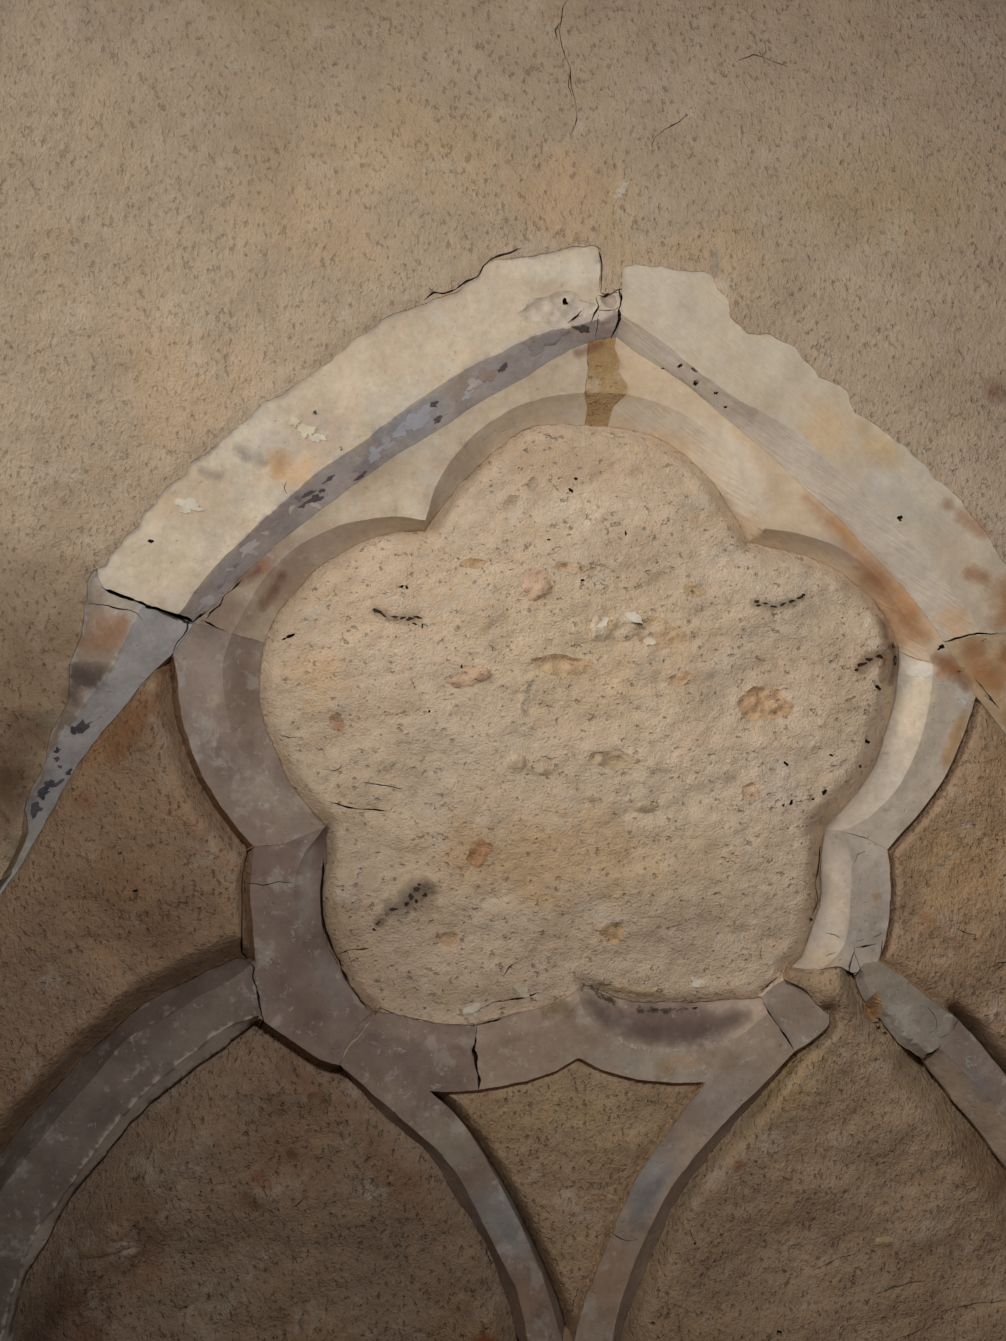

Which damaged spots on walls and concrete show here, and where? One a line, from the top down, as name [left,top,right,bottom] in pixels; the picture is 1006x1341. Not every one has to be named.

crack [555,1,577,132]
spalling [518,291,598,356]
peeling [352,401,443,481]
peeling [198,475,335,612]
crack [95,567,241,643]
spalling [372,608,423,628]
flaking render [590,612,687,649]
crack [943,632,998,642]
spalling [521,654,597,715]
flaking render [737,686,794,722]
spalling [373,884,427,931]
crack [472,963,539,1089]